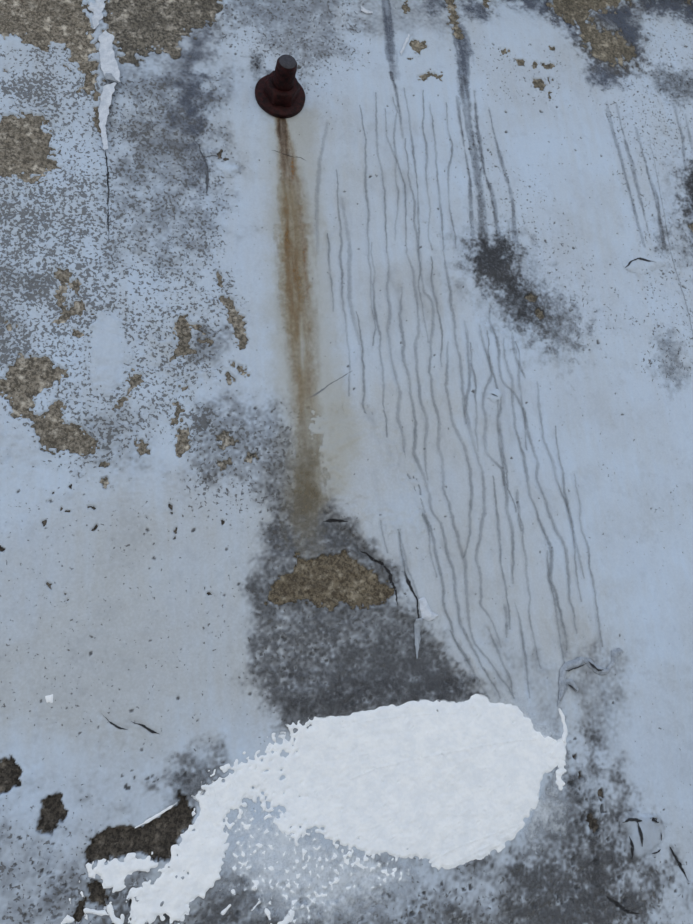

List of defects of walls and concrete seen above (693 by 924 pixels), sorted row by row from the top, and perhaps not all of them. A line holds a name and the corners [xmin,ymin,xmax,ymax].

damp [507,0,550,15]
peeling [0,0,224,136]
peeling [0,112,61,184]
crack [103,152,111,240]
damp [455,26,564,333]
damp [684,162,693,222]
corrosion [277,118,314,421]
peeling [0,353,110,489]
corrosion [289,444,324,531]
crack [323,516,348,524]
crack [360,551,420,618]
spalling [85,793,194,864]